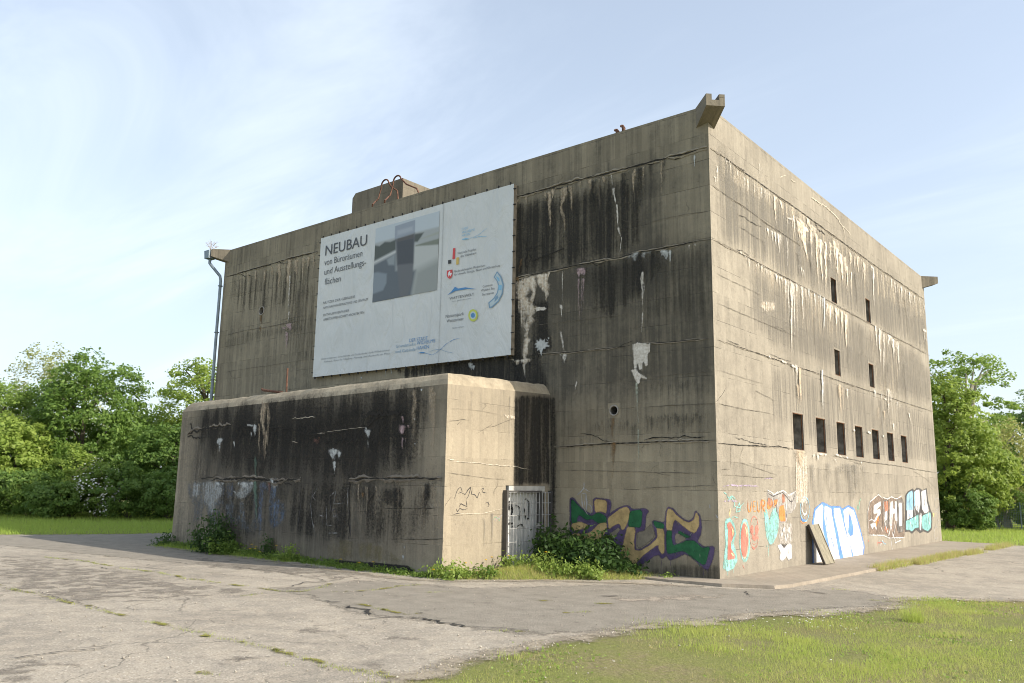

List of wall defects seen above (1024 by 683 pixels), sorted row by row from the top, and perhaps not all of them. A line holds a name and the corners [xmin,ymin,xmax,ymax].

crack [187,416,231,439]
water stain [180,167,674,539]
crack [554,433,796,488]
crack [515,144,932,413]
water stain [714,163,930,455]